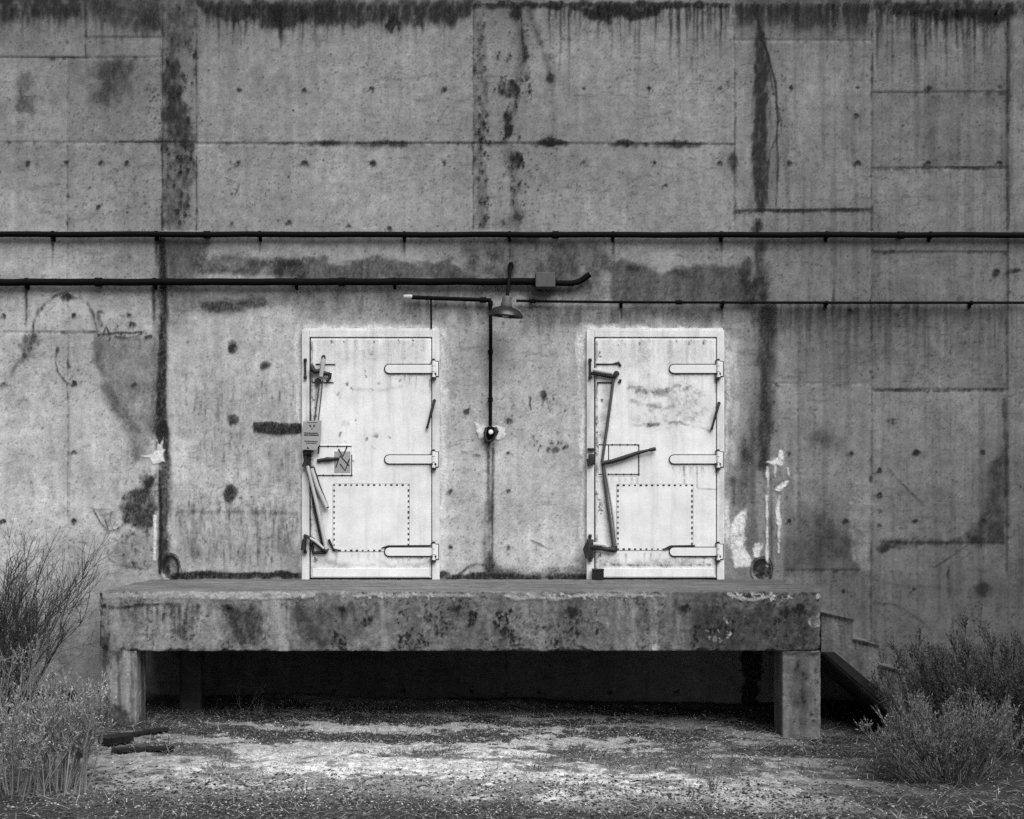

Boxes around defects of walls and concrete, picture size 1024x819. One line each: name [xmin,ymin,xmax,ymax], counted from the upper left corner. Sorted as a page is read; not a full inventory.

leakage [0,0,162,33]
crack [756,4,781,204]
leakage [22,307,43,359]
leakage [90,0,1024,580]